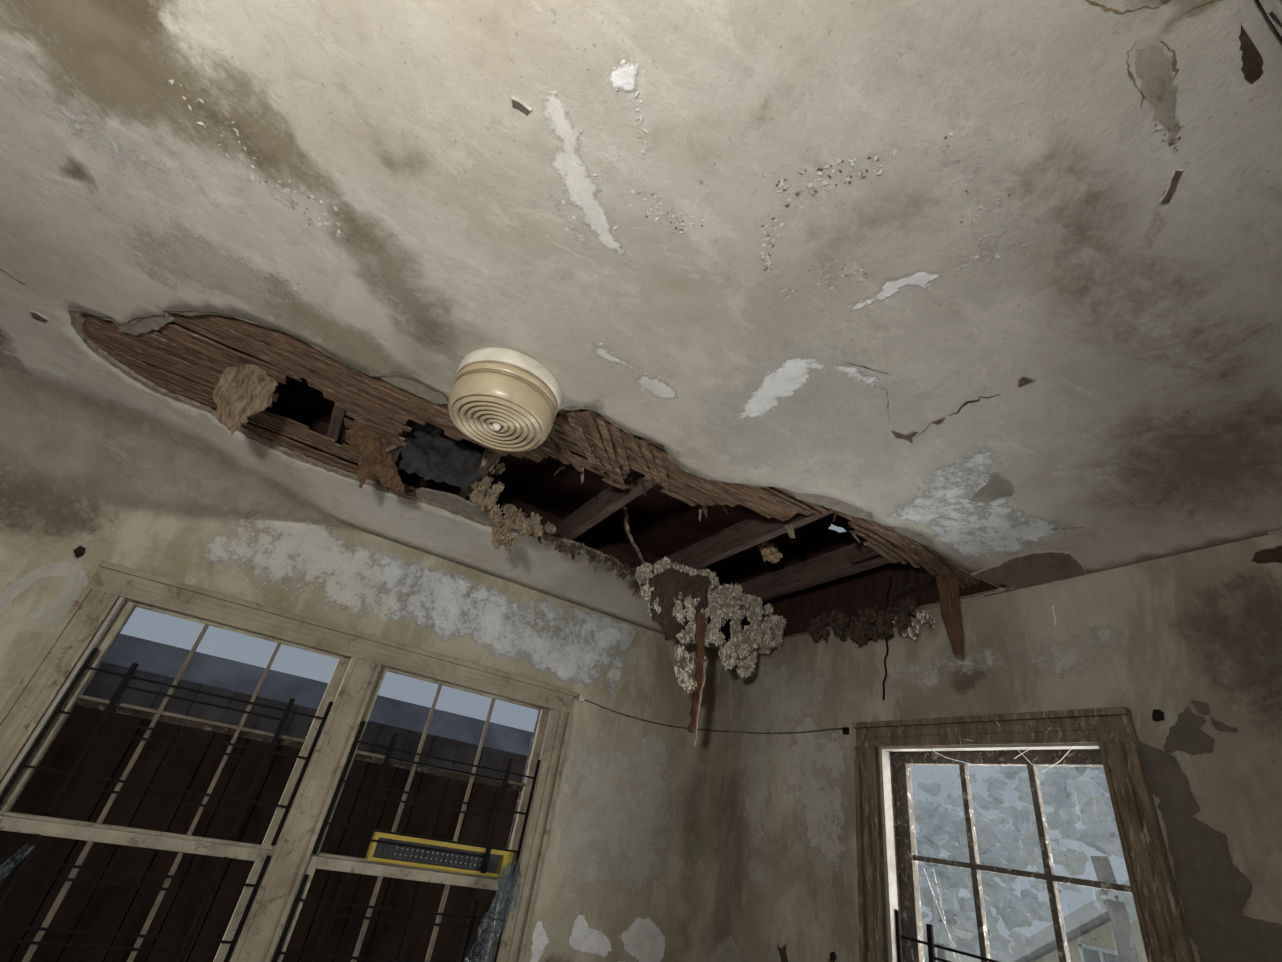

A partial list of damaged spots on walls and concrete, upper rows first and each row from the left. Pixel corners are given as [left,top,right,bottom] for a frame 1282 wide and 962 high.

damp [3,0,334,193]
peeling [609,56,648,154]
peeling [510,91,631,264]
peeling [847,270,939,310]
peeling [731,356,880,425]
crack [843,362,1036,444]
damp [0,474,99,535]
peeling [884,448,1086,598]
peeling [201,516,644,699]
peeling [1138,700,1282,962]
peeling [530,921,550,962]
peeling [569,912,668,962]